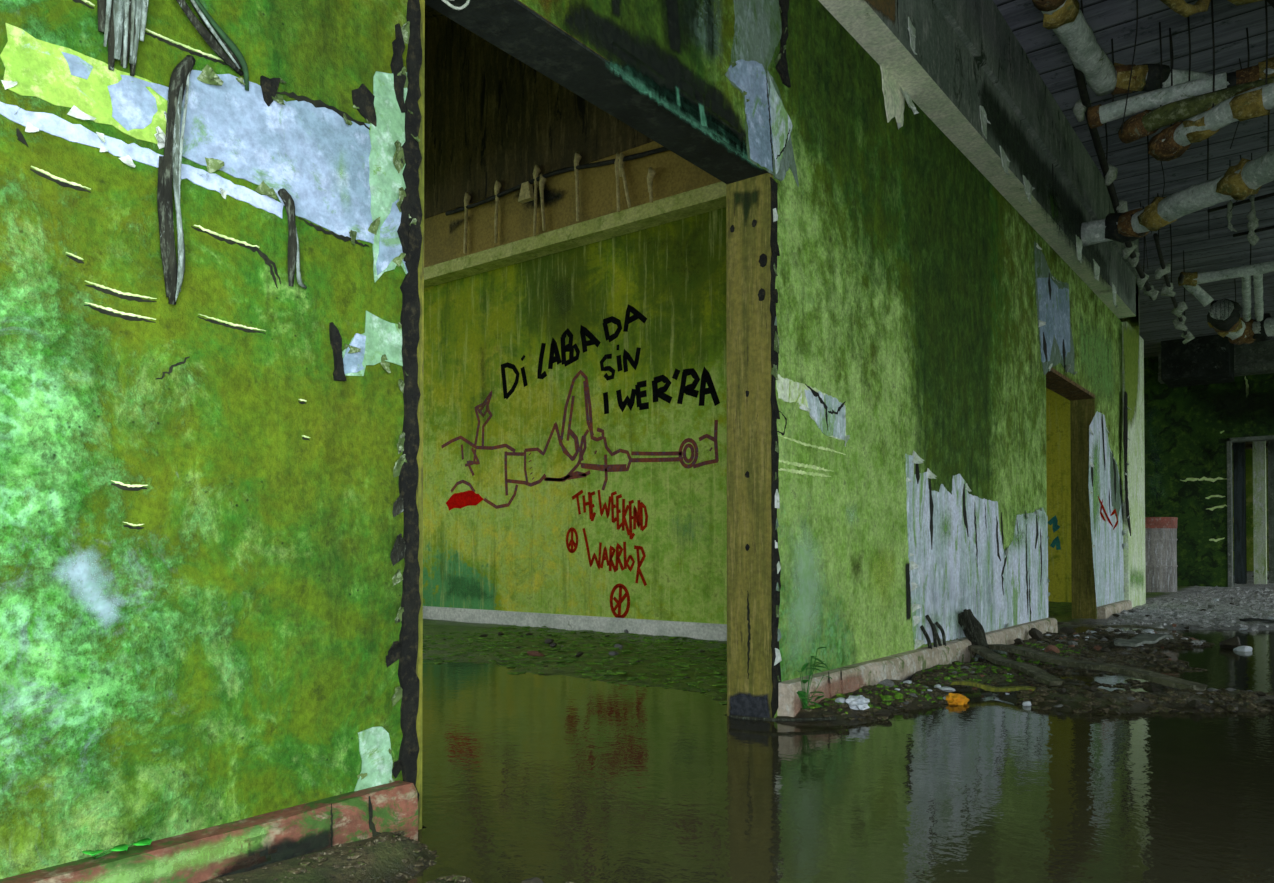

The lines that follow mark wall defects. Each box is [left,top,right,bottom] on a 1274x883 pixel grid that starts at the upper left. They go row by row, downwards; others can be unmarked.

peeling [0,0,422,800]
peeling [725,0,850,718]
peeling [905,450,1050,649]
peeling [1088,391,1131,607]